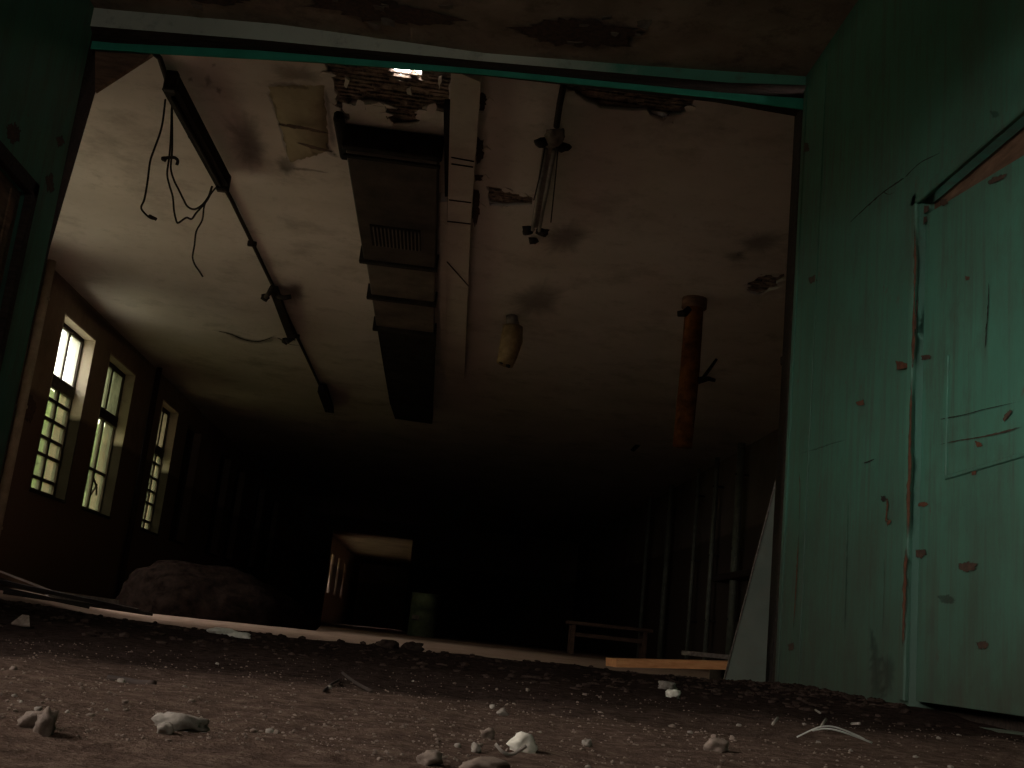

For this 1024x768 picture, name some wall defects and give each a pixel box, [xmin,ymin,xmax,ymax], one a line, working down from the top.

flaking render [319,64,451,126]
flaking render [556,85,696,127]
flaking render [472,137,536,226]